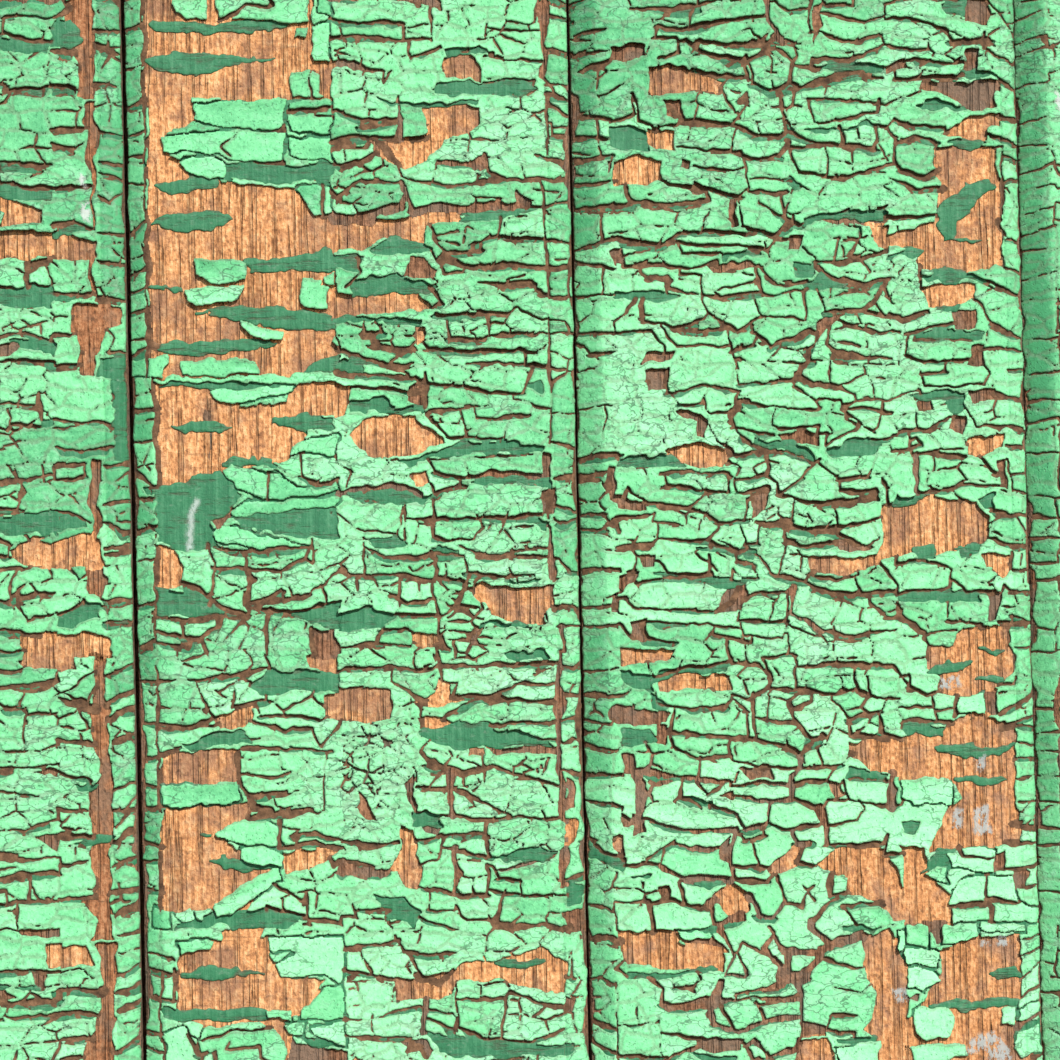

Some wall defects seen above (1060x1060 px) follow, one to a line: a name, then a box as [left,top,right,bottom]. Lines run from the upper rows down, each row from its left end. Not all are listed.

crack [0,0,162,517]
crack [985,70,1060,256]
peeling [0,0,142,1060]
peeling [124,0,589,1060]
crack [298,451,423,504]
peeling [544,0,1060,1060]
crack [0,793,100,935]
crack [0,654,135,765]
crack [949,659,1060,924]
crack [0,968,142,1060]
crack [178,1021,274,1060]
crack [265,867,703,1060]